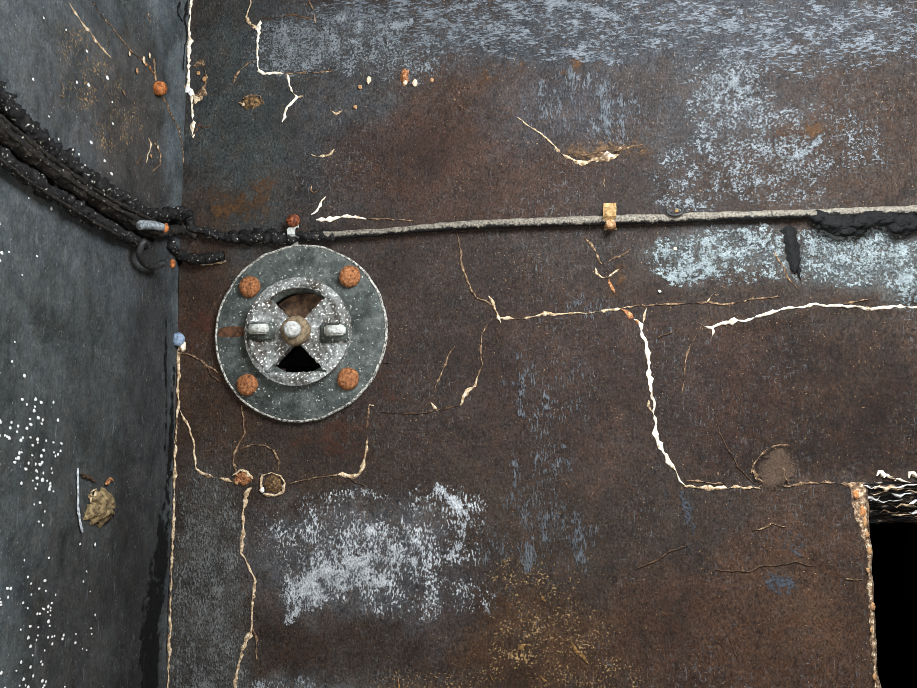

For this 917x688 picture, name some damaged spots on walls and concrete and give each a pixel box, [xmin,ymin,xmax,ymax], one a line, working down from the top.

crack [185,0,212,138]
crack [233,0,334,122]
crack [517,117,642,184]
peeling [246,0,917,214]
flaking render [644,221,917,311]
leakage [774,225,801,288]
crack [167,231,917,688]
rust [370,559,653,688]
spalling [850,470,917,688]